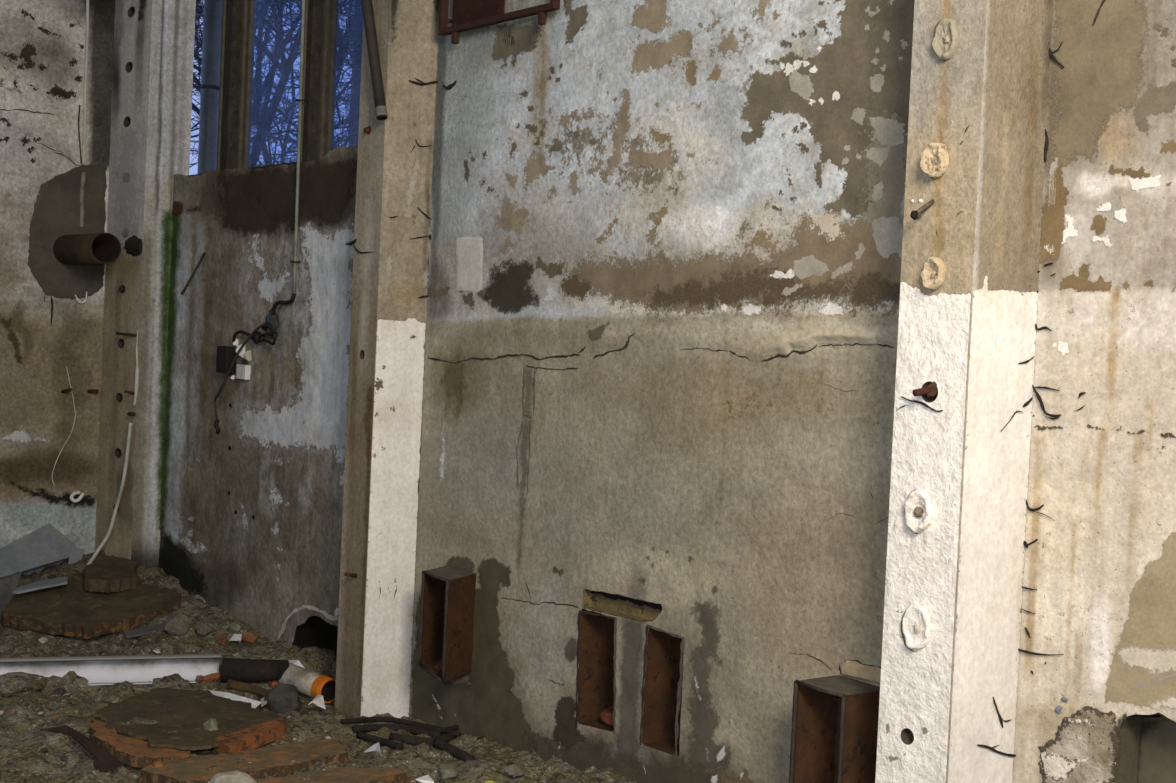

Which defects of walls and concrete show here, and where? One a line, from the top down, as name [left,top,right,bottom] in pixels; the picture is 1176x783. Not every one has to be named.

leakage [158,212,206,596]
leakage [217,158,357,236]
crack [424,329,636,504]
peeling [563,0,588,45]
peeling [464,88,697,273]
peeling [631,0,697,76]
crack [681,343,893,363]
peeling [738,0,915,218]
peeling [1058,263,1130,293]
peeling [1039,0,1176,263]
leakage [410,366,752,783]
spalling [1038,696,1120,783]